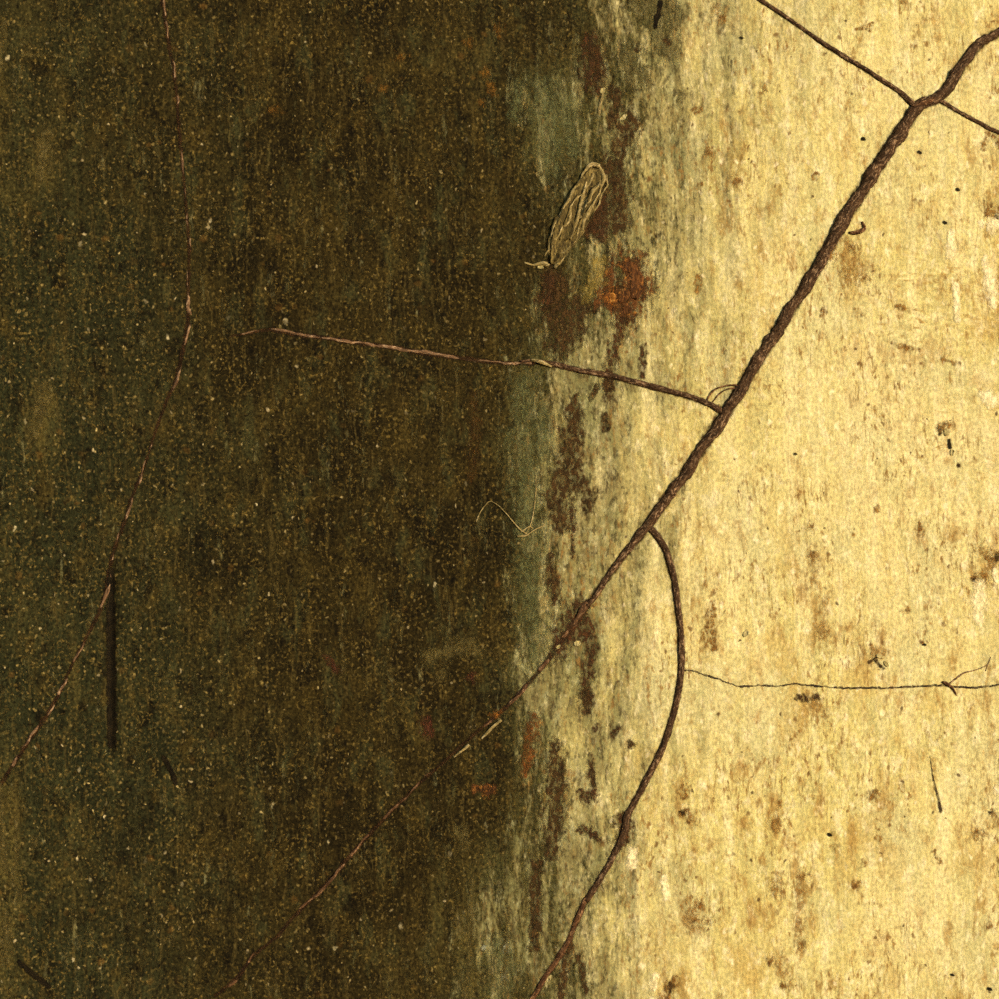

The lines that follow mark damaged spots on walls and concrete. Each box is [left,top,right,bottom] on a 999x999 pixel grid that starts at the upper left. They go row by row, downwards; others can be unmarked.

water stain [0,0,689,999]
crack [214,0,999,999]
rust [594,244,658,393]